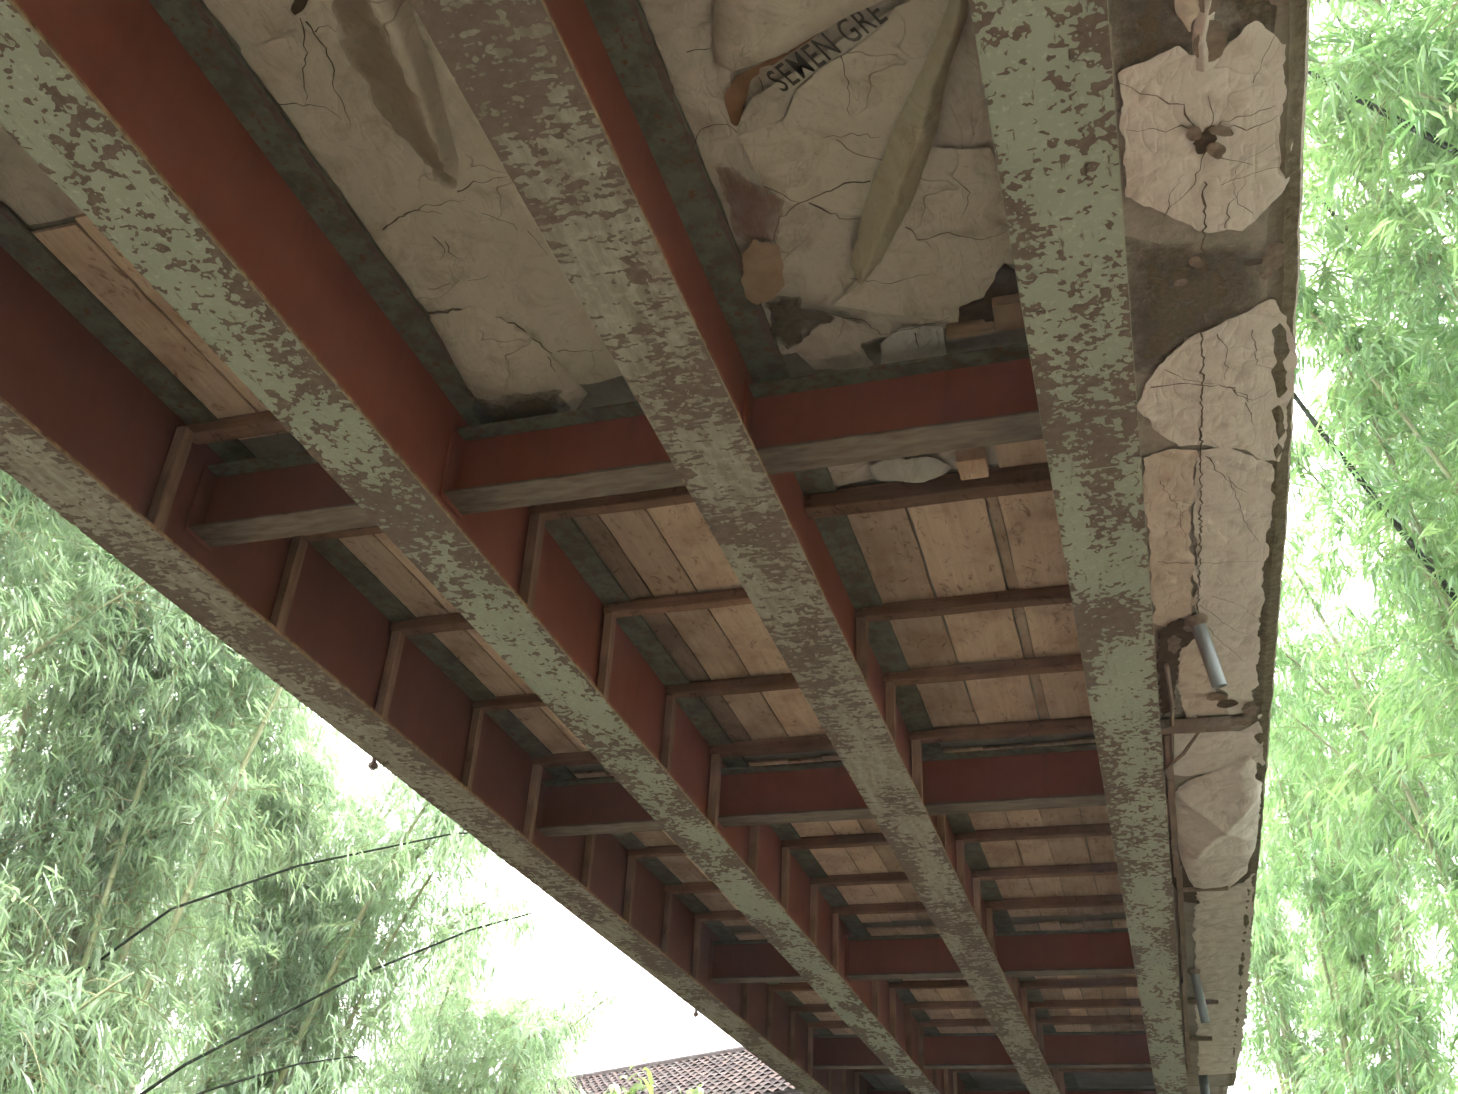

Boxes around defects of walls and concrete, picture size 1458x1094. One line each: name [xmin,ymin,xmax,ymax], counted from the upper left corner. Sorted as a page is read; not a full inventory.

crack [280,18,351,126]
crack [382,177,600,372]
crack [763,56,881,254]
crack [825,312,948,351]
crack [850,180,1005,284]
crack [1120,35,1285,661]
spalling [1186,125,1234,159]
spalling [1193,0,1228,62]
peeling [0,0,1060,1094]
peeling [958,0,1203,1094]